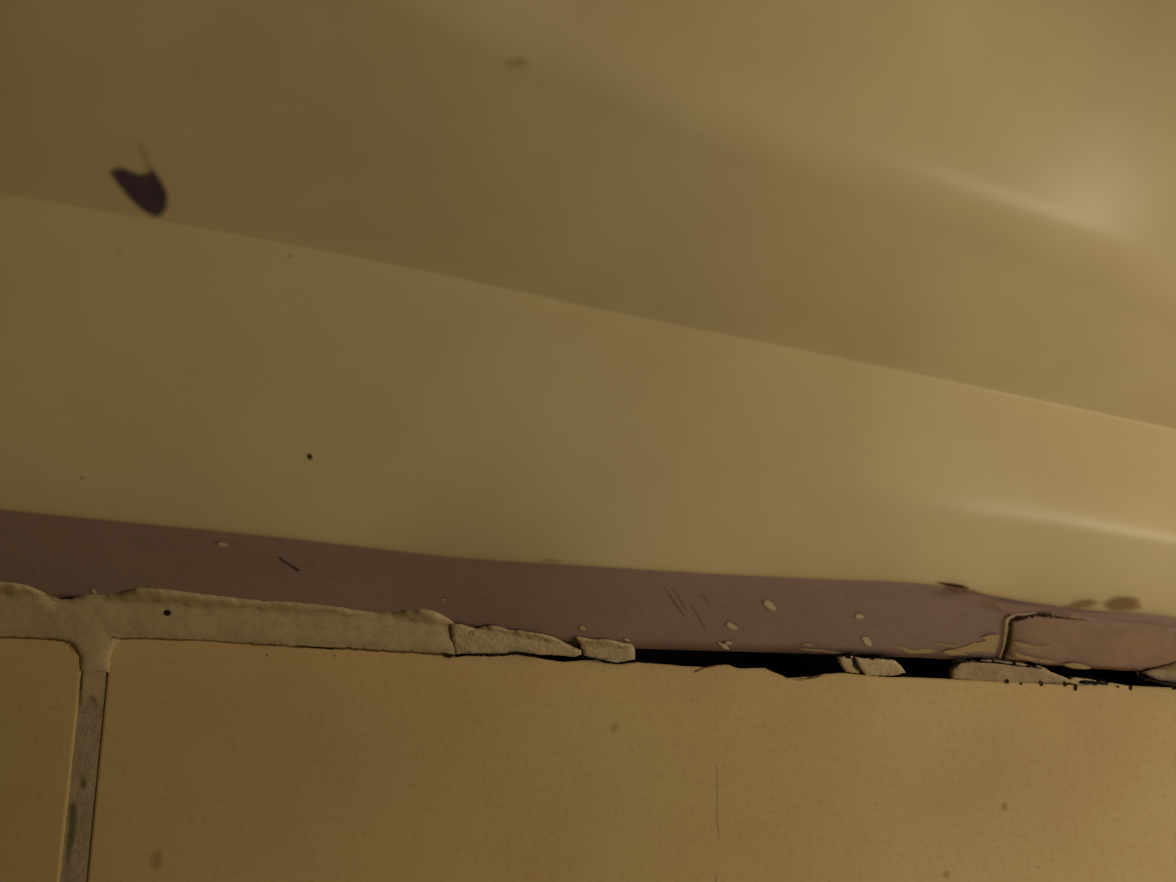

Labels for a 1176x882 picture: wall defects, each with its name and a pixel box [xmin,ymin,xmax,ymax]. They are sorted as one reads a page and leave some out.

peeling [896,634,1000,655]
peeling [1014,642,1090,669]
crack [952,612,1176,687]